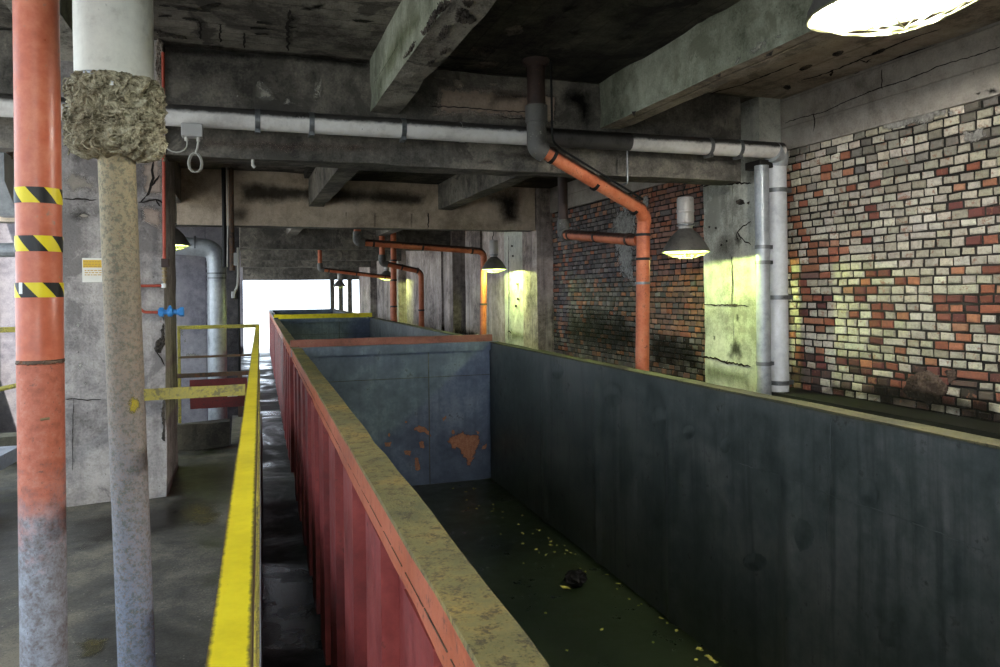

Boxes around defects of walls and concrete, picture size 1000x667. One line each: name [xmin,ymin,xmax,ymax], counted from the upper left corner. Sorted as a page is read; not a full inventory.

crack [711,29,999,131]
crack [138,162,162,206]
crack [703,356,751,367]
spalling [902,368,957,399]
peeling [447,430,487,466]